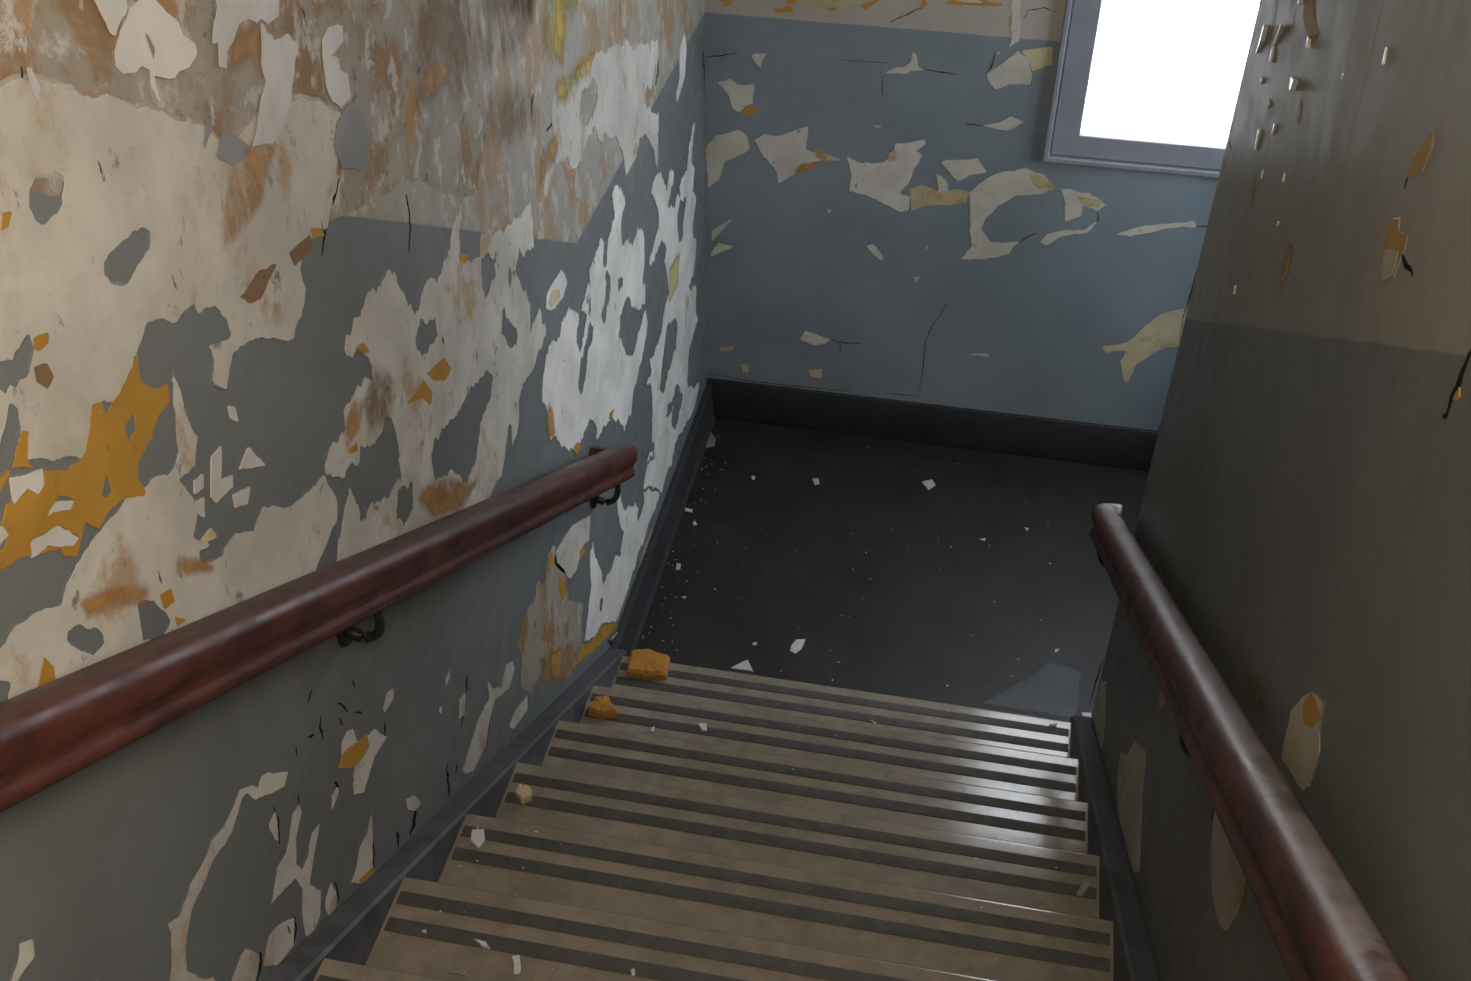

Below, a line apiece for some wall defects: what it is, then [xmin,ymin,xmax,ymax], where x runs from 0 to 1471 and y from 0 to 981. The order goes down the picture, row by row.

peeling [1273,0,1319,48]
peeling [1404,126,1435,189]
peeling [1118,220,1207,237]
peeling [1101,304,1189,384]
peeling [0,0,1107,775]
crack [1442,349,1471,419]
peeling [167,687,394,981]
peeling [406,795,421,836]
peeling [470,829,485,849]
peeling [8,936,35,981]
peeling [511,955,521,974]